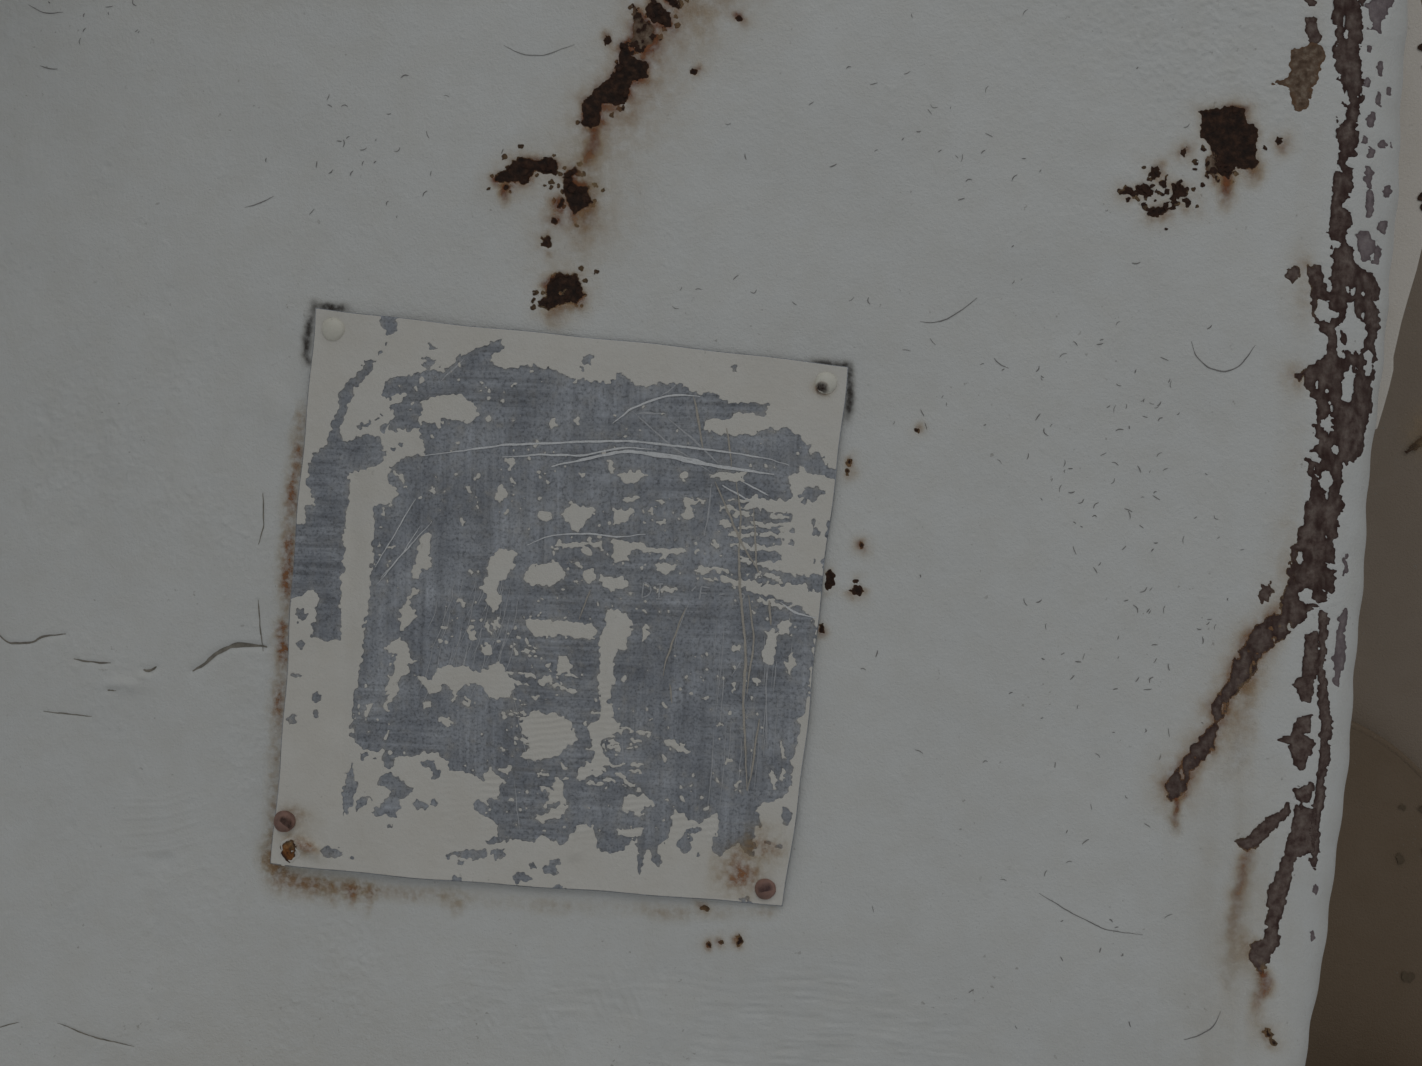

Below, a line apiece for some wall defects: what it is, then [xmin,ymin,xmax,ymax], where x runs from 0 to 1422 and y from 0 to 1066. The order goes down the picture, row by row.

corrosion [486,0,689,248]
corrosion [1117,104,1283,230]
corrosion [530,266,600,313]
peeling [271,309,847,906]
corrosion [729,855,770,892]